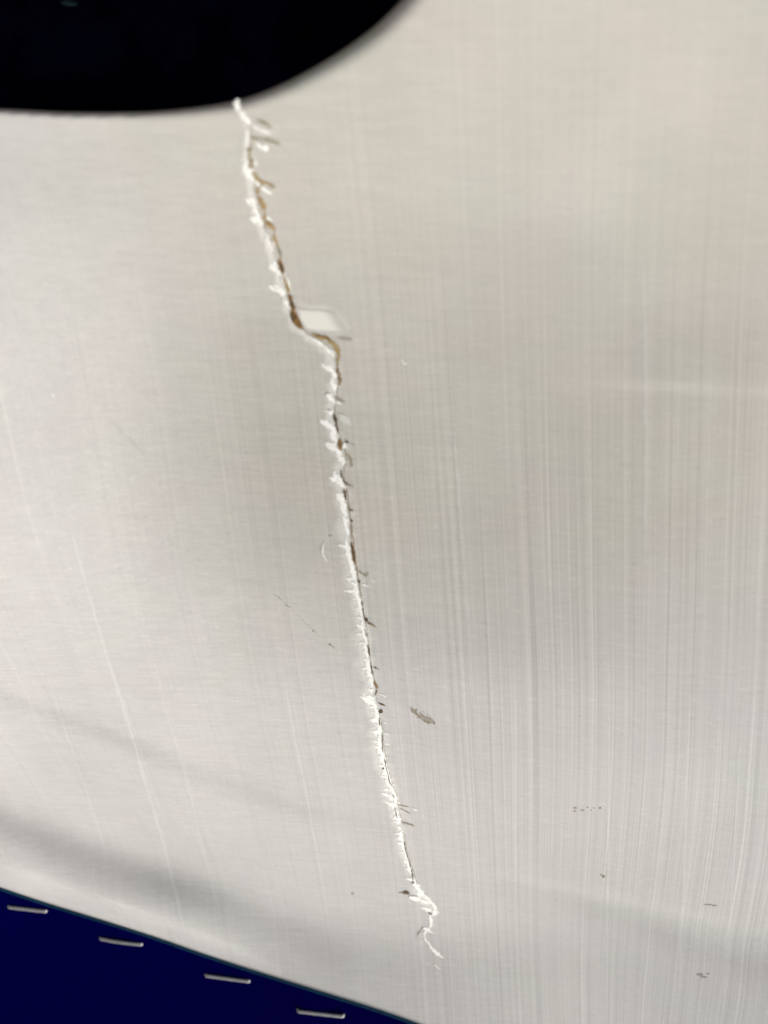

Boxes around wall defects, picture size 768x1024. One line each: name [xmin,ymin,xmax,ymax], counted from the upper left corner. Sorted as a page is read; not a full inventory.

crack [233,99,443,969]